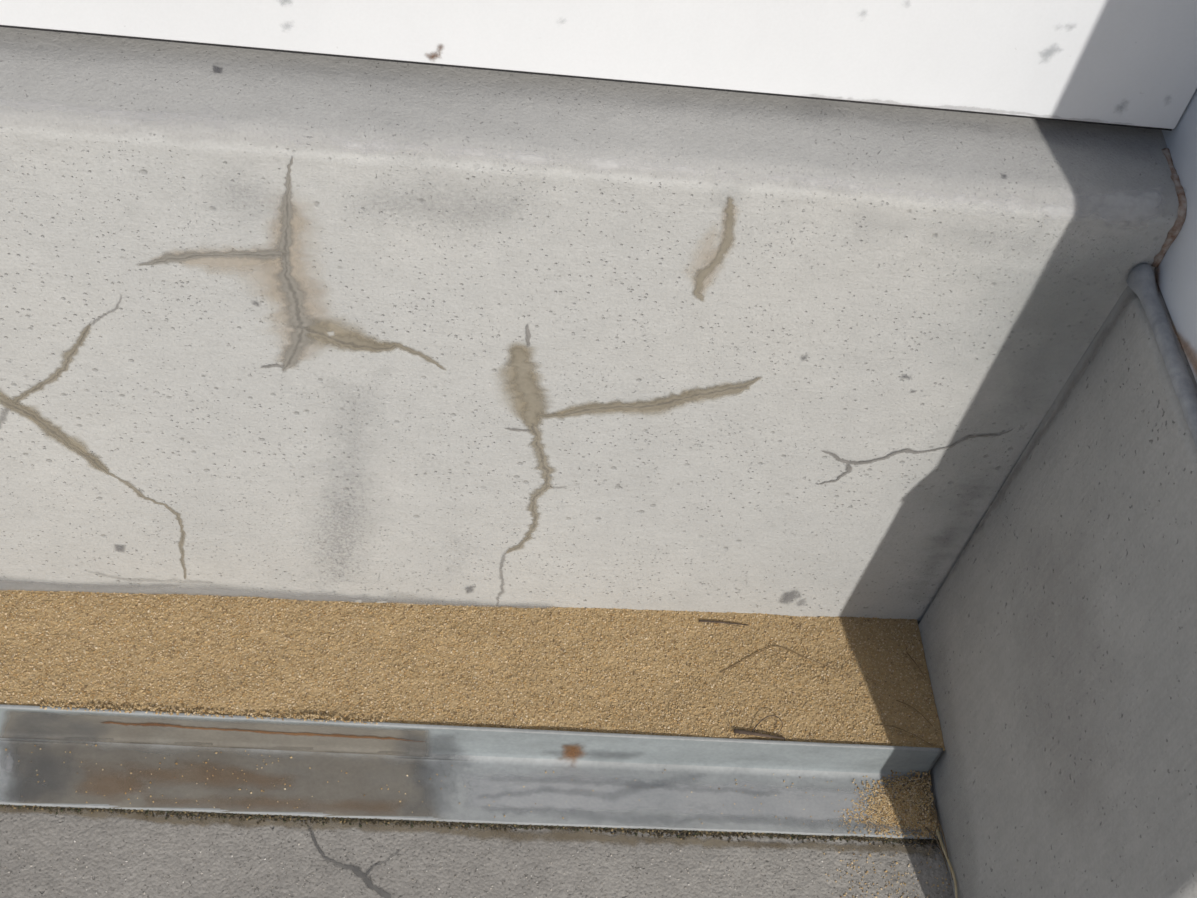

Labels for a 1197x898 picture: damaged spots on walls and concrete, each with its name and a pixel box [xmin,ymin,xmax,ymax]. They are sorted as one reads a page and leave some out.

crack [139,158,445,371]
crack [694,198,734,301]
crack [0,325,186,579]
crack [506,325,761,553]
crack [818,430,1011,485]
crack [309,828,401,898]